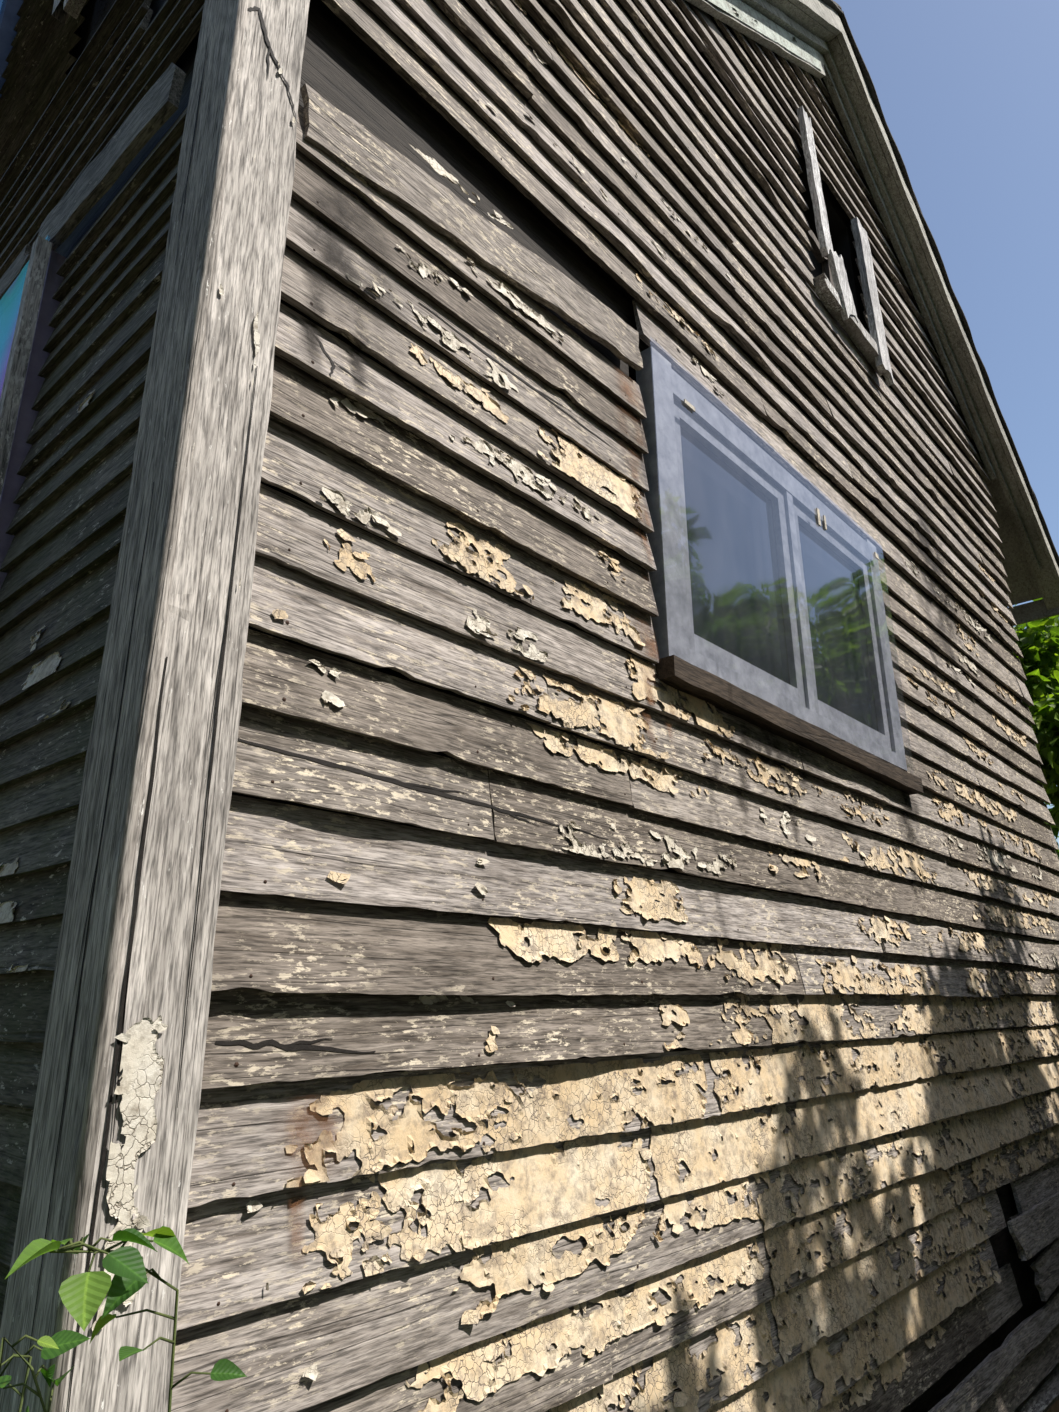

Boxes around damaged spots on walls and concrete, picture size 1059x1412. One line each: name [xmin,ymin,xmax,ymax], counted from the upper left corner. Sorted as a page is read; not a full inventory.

peeling [409,144,513,229]
peeling [466,257,566,342]
peeling [349,279,519,423]
peeling [450,426,643,520]
peeling [320,487,402,582]
peeling [432,522,534,600]
peeling [22,625,61,690]
peeling [309,659,345,707]
peeling [901,555,993,718]
peeling [465,580,938,884]
peeling [285,770,1059,1412]
peeling [92,1015,168,1332]